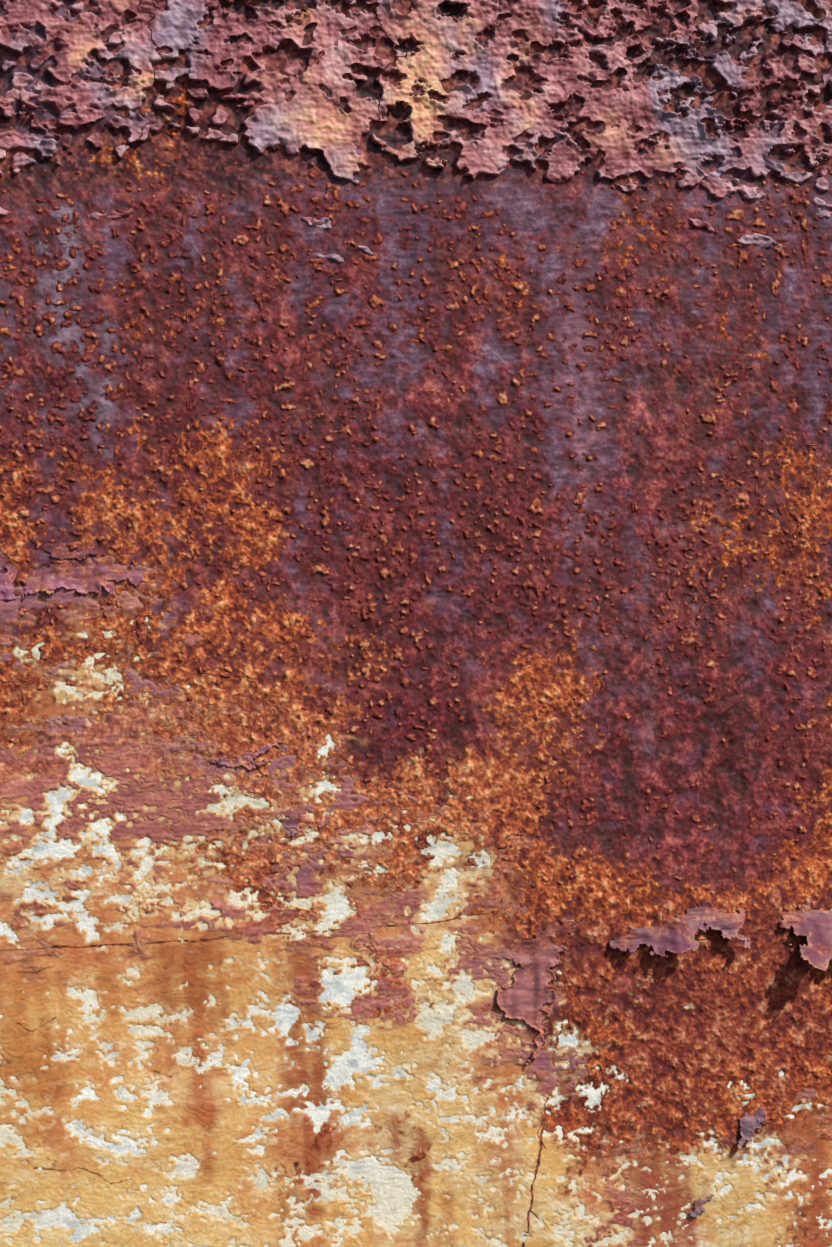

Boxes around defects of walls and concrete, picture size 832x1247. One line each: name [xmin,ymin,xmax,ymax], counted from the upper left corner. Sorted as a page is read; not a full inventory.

peeling [0,0,832,218]
rust [89,85,375,389]
peeling [301,217,332,230]
rust [395,172,575,403]
rust [537,173,832,371]
peeling [737,233,782,249]
rust [0,275,832,1247]
crack [0,935,229,974]
crack [268,928,340,936]
peeling [0,543,832,1247]
crack [377,909,506,927]
crack [522,1005,568,1247]